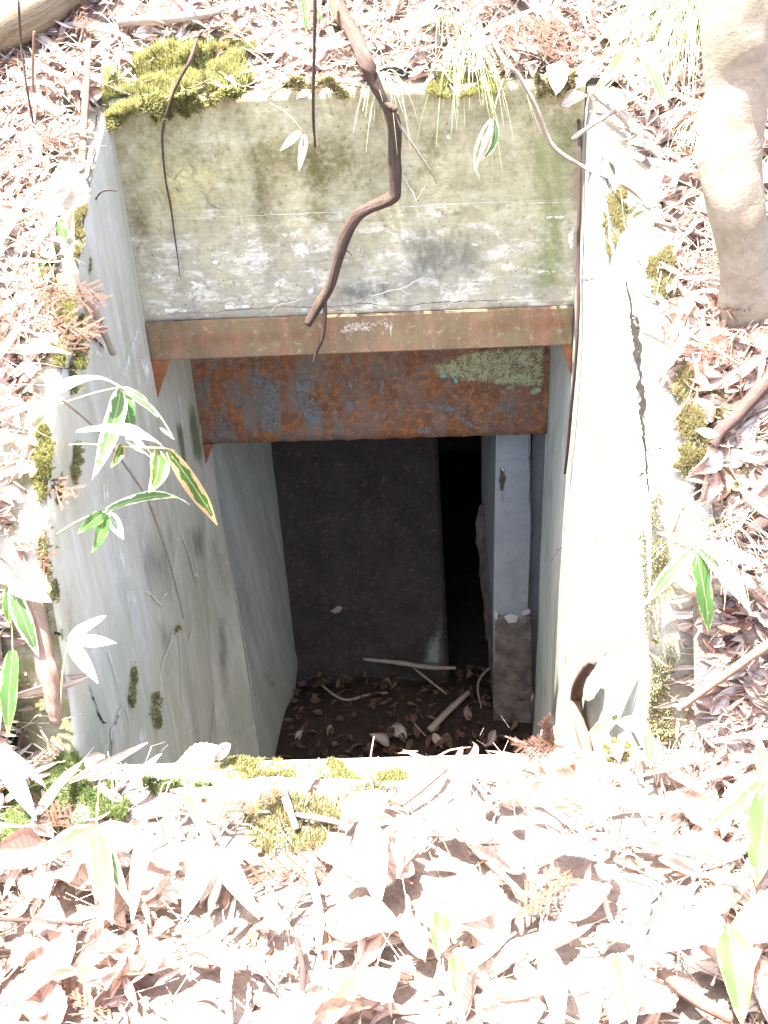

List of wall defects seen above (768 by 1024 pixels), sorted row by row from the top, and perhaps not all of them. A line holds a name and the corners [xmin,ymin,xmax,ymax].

water stain [282,229,310,258]
water stain [402,240,478,270]
crack [626,272,670,501]